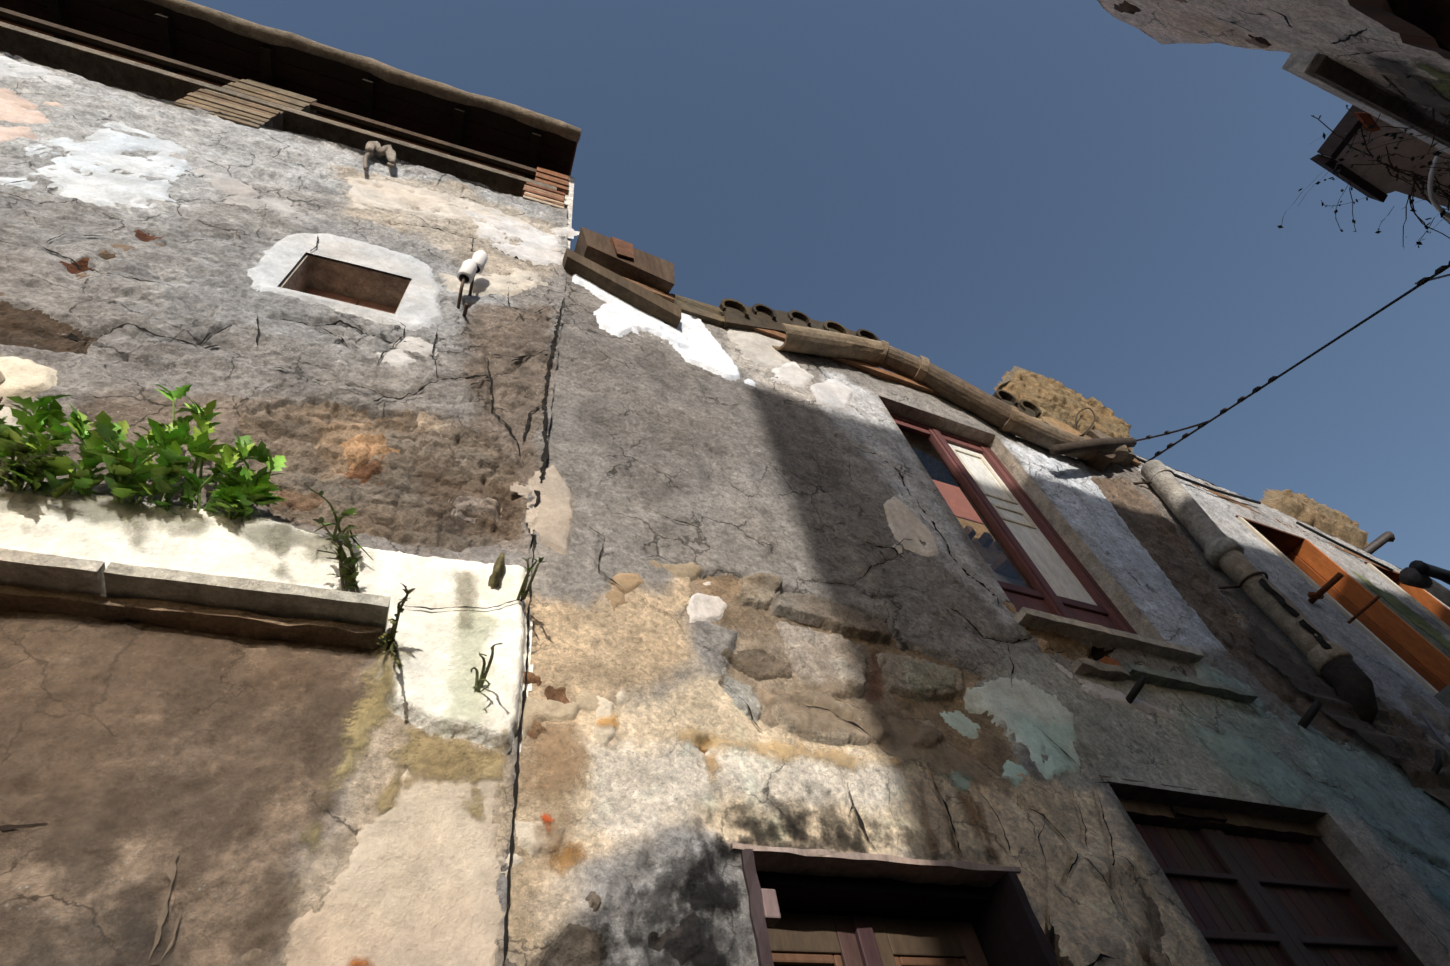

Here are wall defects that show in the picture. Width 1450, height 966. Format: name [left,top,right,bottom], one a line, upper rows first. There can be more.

flaking render [0,56,307,218]
crack [0,234,175,288]
flaking render [345,177,853,412]
leakage [27,886,175,966]
leakage [0,610,368,889]
crack [27,212,564,966]
spalling [237,400,573,589]
flaking render [521,671,627,748]
leakage [663,851,740,966]
spalling [605,560,1080,792]
crack [815,441,1074,684]
crack [981,730,1138,913]